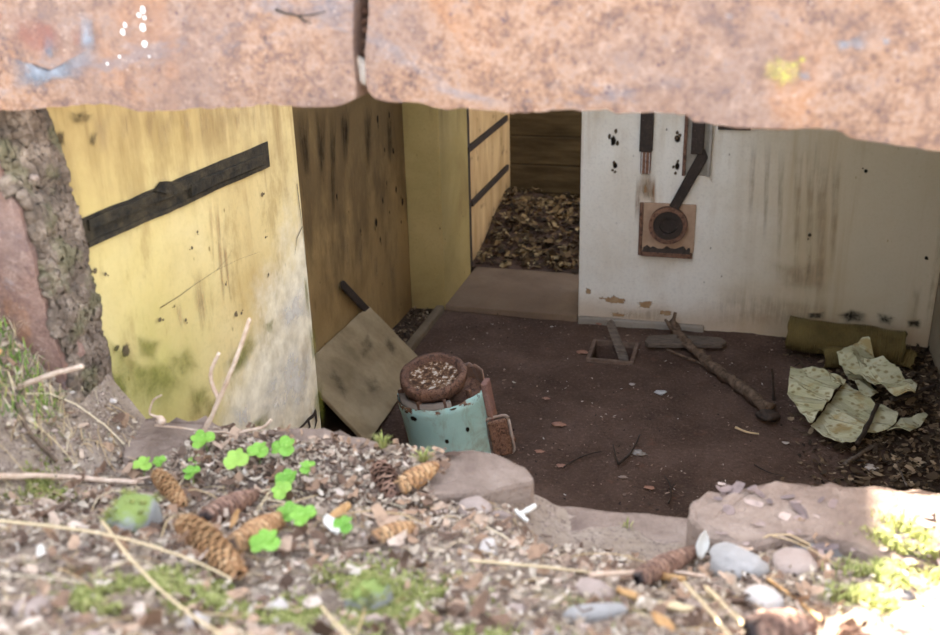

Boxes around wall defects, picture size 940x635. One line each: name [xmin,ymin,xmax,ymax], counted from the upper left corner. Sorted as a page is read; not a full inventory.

peeling [586,288,625,317]
peeling [639,301,671,316]